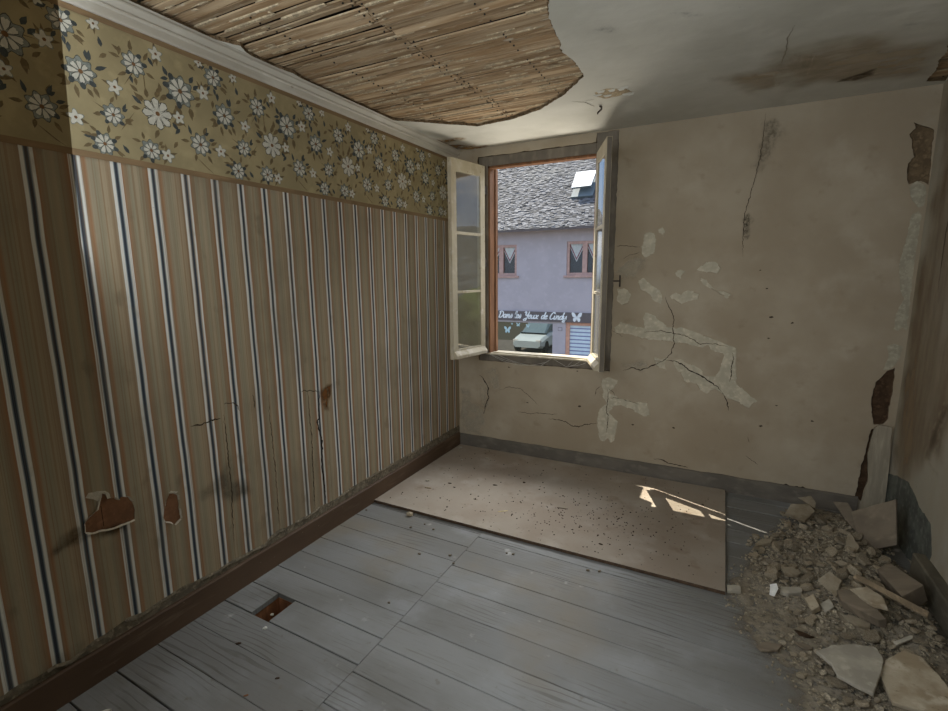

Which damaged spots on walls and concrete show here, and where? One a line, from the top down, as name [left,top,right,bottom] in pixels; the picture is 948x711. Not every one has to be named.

spalling [154,11,367,108]
peeling [641,227,665,257]
crack [742,112,767,250]
spalling [894,123,933,331]
crack [481,376,637,433]
peeling [596,377,651,443]
peeling [617,278,700,305]
crack [623,298,734,411]
peeling [613,313,757,409]
spalling [855,369,894,501]
damp [897,160,948,475]